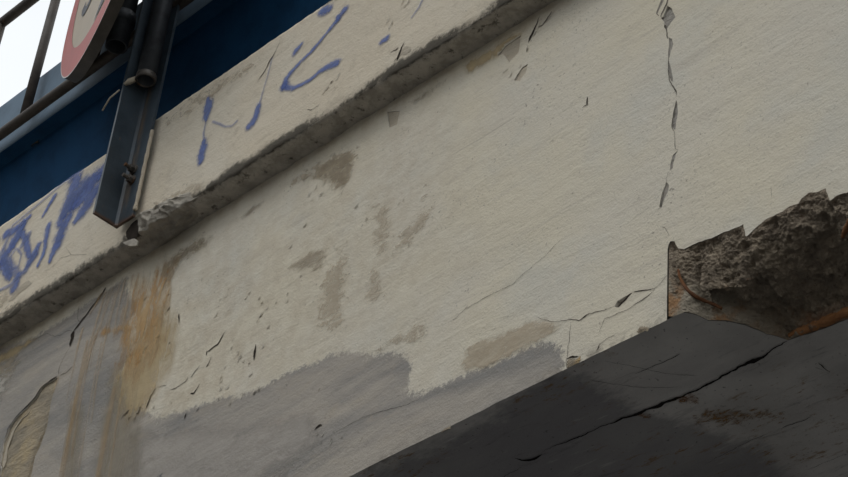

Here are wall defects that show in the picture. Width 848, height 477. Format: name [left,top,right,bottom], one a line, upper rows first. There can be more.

crack [648,0,678,235]
spalling [669,189,848,340]
peeling [0,377,58,477]
crack [504,274,787,477]